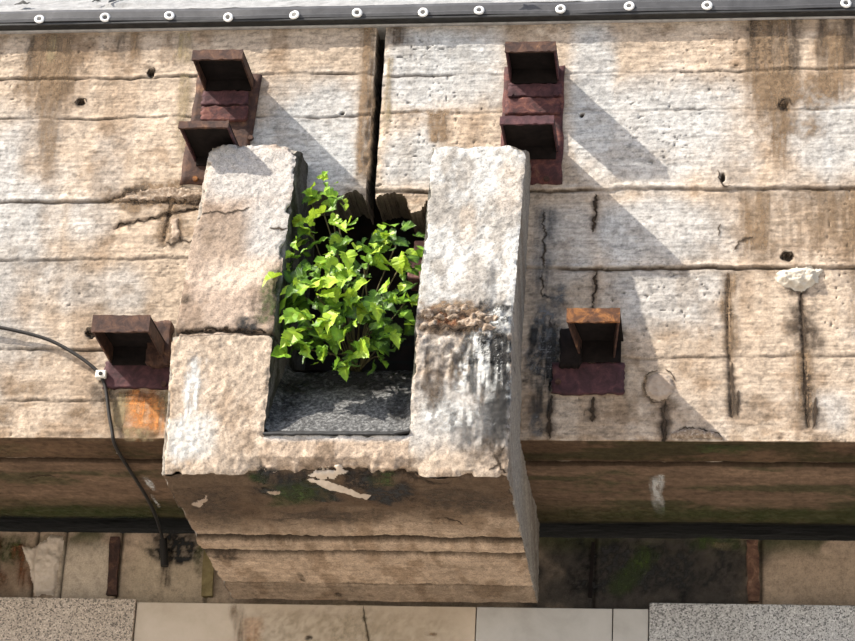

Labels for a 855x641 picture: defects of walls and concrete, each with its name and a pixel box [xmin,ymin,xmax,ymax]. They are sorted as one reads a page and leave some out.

leakage [16,35,82,167]
leakage [746,19,854,161]
crack [116,199,250,246]
crack [590,195,598,232]
corrosion [112,390,168,440]
spalling [418,300,498,335]
leakage [489,343,509,432]
crack [721,274,739,417]
crack [799,293,818,429]
spalling [192,492,235,521]
spalling [251,465,501,523]
spalling [213,548,237,560]